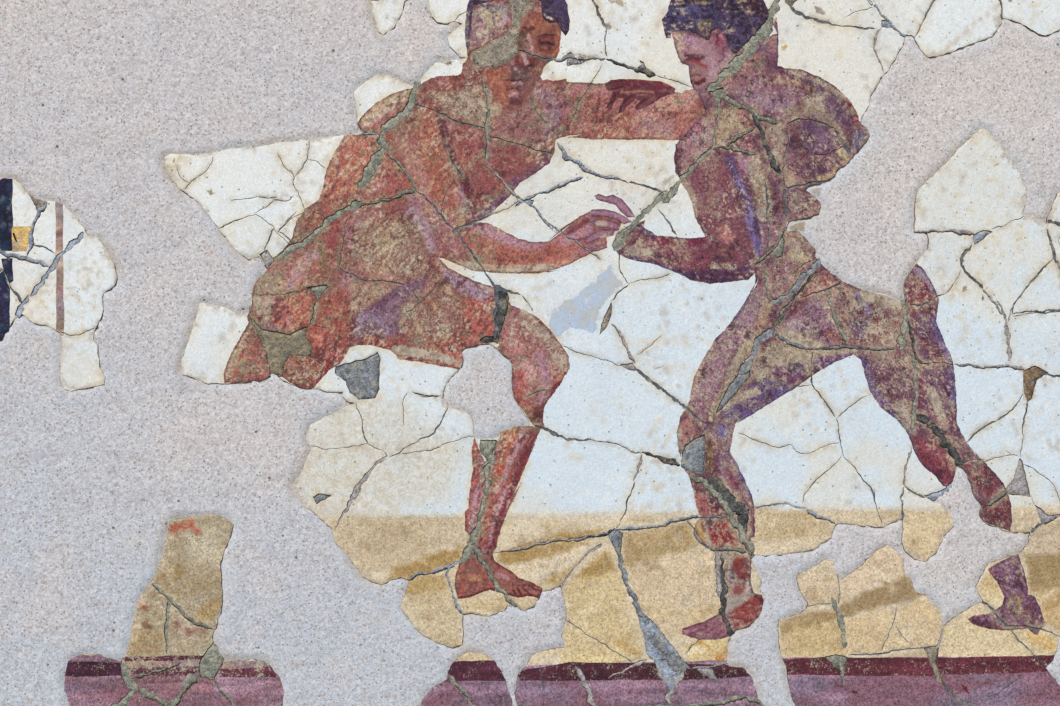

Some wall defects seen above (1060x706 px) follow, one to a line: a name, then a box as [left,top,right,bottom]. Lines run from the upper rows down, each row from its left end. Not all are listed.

spalling [26,189,47,214]
spalling [259,250,275,269]
spalling [961,230,992,260]
spalling [249,316,313,376]
crack [218,0,1060,706]
spalling [327,352,381,416]
spalling [313,493,331,504]
spalling [924,483,952,501]
spalling [944,455,1060,633]
spalling [199,642,223,680]
spalling [631,604,742,701]
spalling [924,645,951,691]